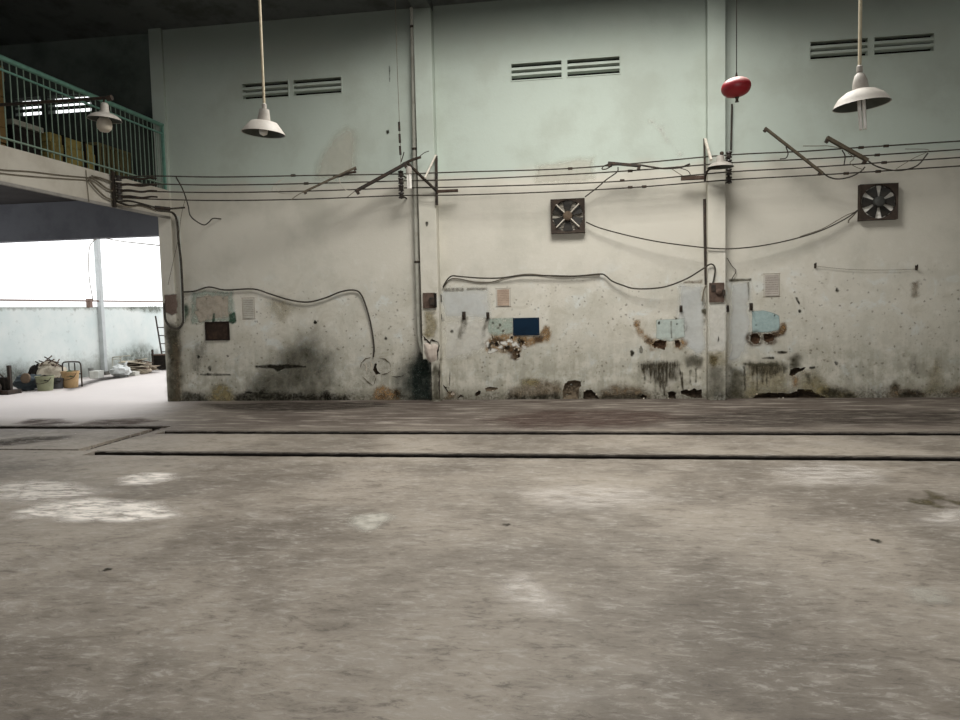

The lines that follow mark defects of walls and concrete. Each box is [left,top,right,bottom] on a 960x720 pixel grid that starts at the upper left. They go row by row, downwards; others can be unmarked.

spalling [486,335,526,360]
spalling [630,339,686,356]
spalling [746,332,775,346]
water stain [166,325,347,402]
water stain [402,354,440,400]
spalling [562,380,599,399]
water stain [603,355,799,399]